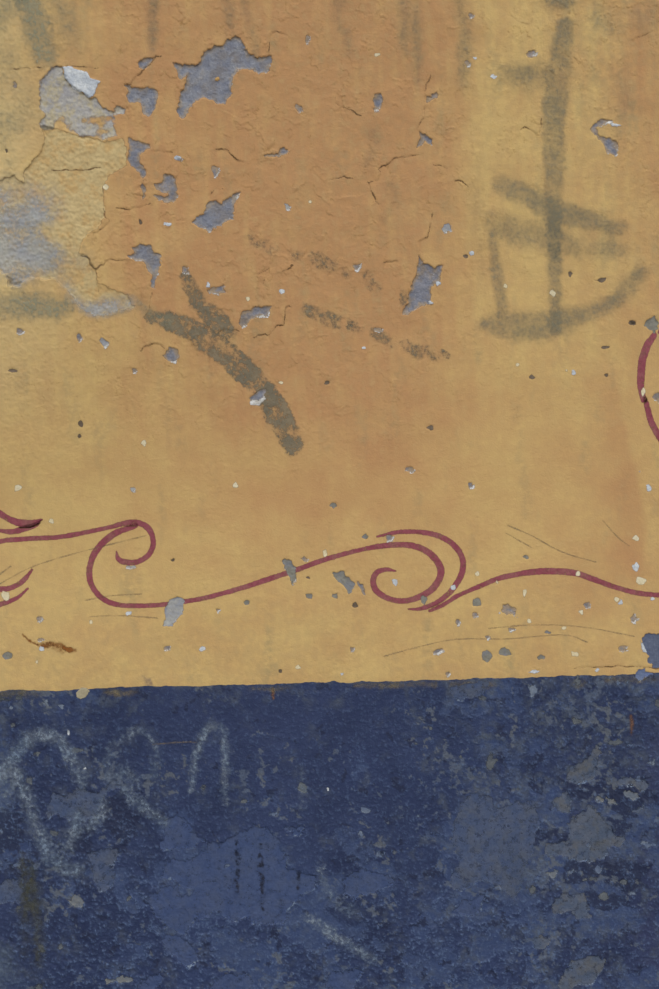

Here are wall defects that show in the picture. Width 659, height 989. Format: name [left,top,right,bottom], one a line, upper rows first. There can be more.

peeling [174,36,272,118]
peeling [591,119,621,157]
peeling [0,66,179,316]
peeling [192,192,240,233]
peeling [402,257,443,315]
rust [23,636,74,653]
peeling [609,633,659,686]